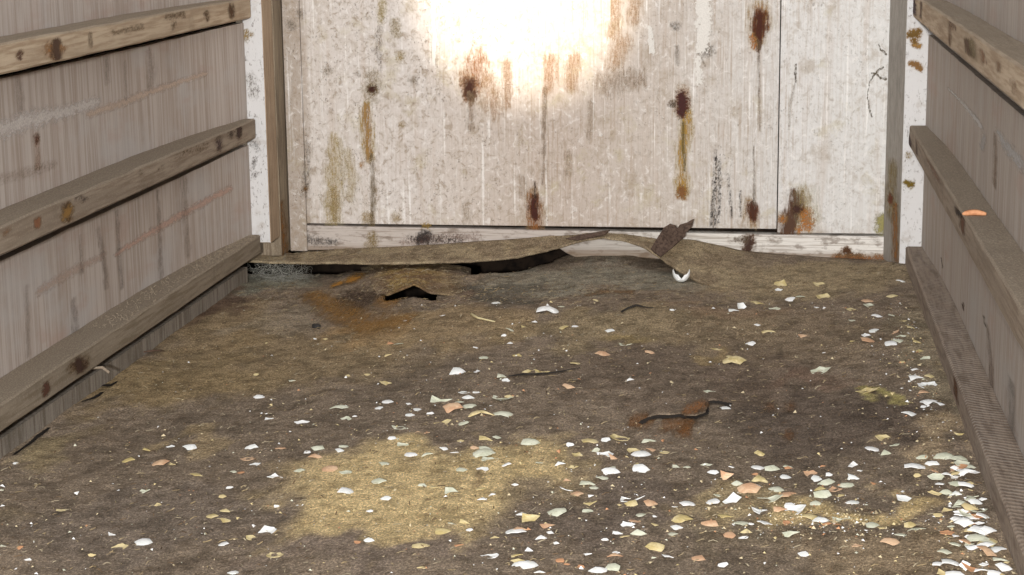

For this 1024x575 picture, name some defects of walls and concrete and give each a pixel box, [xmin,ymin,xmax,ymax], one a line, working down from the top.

rust [45,38,66,61]
rust [748,1,770,60]
rust [459,50,490,131]
rust [669,89,692,200]
rust [526,183,544,230]
rust [734,193,759,251]
rust [778,188,814,235]
crack [639,391,732,424]